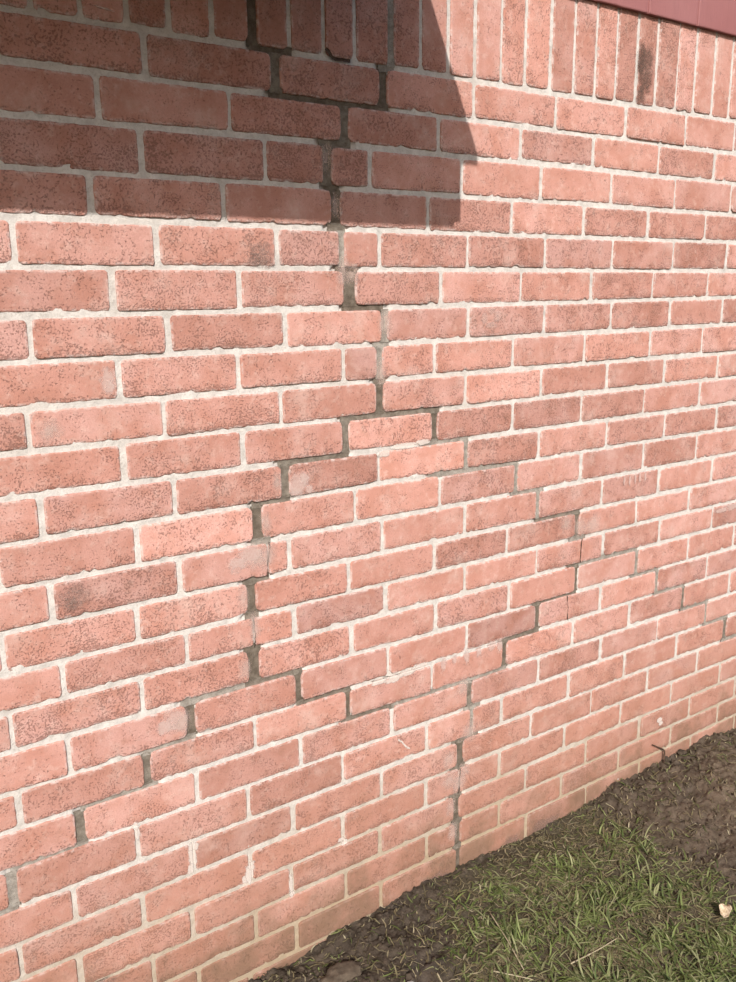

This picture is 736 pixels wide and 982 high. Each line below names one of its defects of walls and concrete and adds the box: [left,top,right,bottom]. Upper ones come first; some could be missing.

water stain [637,45,653,101]
crack [245,0,585,565]
crack [0,548,736,916]